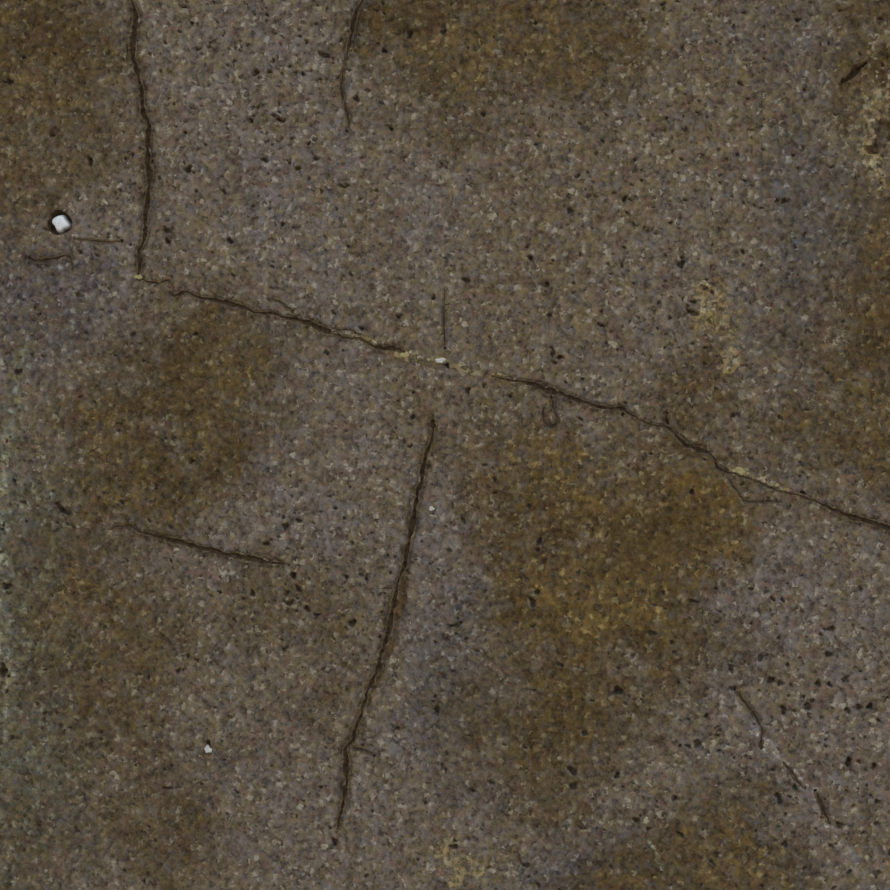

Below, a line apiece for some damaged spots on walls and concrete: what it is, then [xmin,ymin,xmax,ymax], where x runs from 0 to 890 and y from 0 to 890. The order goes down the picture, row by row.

crack [29,0,890,533]
crack [101,523,289,567]
crack [334,416,438,832]